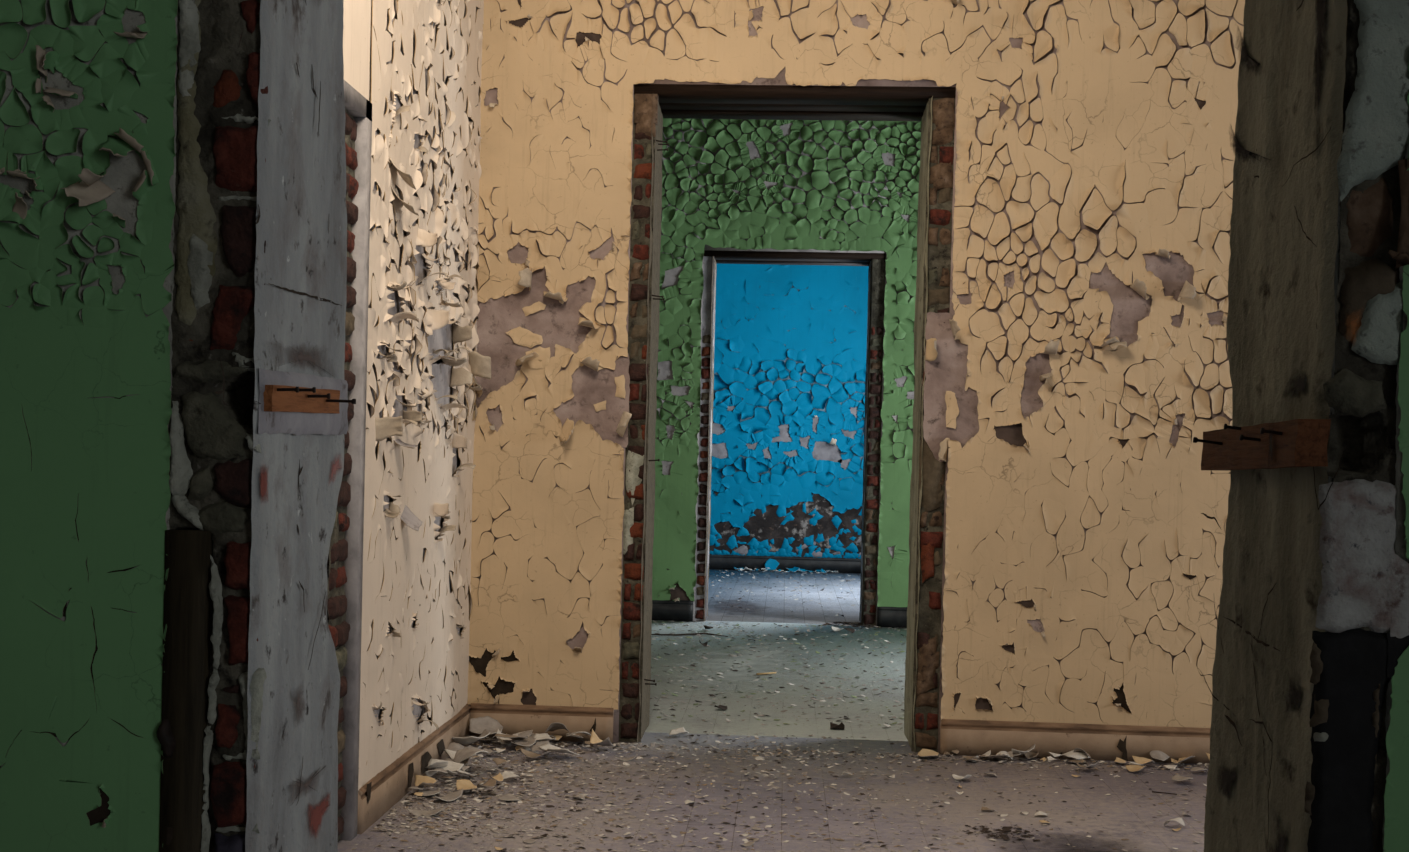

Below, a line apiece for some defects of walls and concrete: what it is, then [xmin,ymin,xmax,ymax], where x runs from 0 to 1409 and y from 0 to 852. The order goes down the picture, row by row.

peeling [506,0,532,27]
peeling [748,6,764,36]
peeling [850,14,870,29]
peeling [1009,37,1023,49]
peeling [484,88,498,107]
peeling [1207,310,1227,326]
flaking render [0,0,271,852]
flaking render [374,95,736,742]
flaking render [734,88,1210,772]
flaking render [1304,0,1409,852]
crack [0,510,143,768]